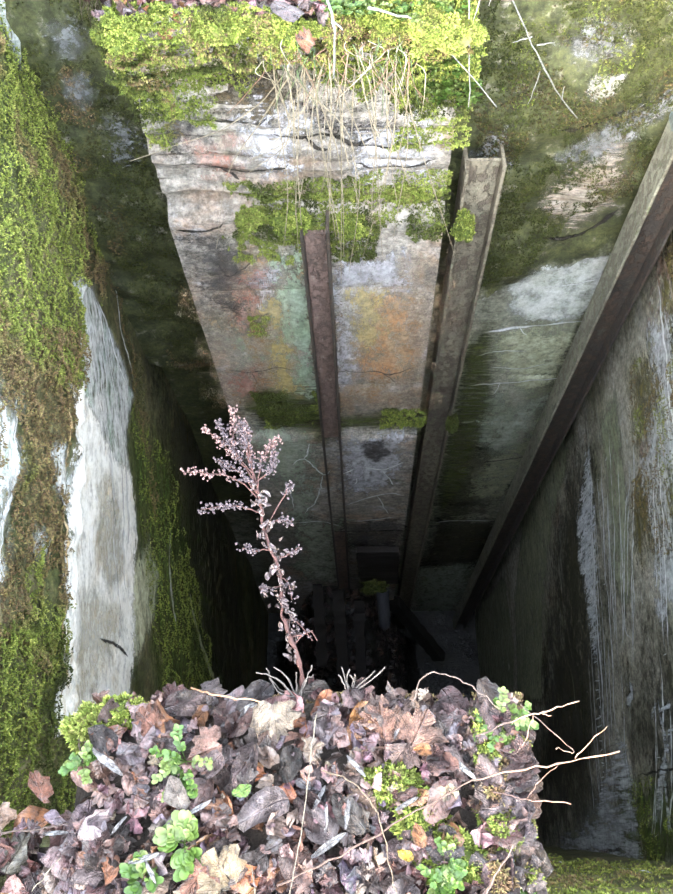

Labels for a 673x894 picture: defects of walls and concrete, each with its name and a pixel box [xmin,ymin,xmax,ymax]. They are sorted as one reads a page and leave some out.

crack [339,367,414,382]
rust [335,257,437,412]
leakage [487,253,611,391]
leakage [337,427,411,496]
leakage [475,294,673,859]
crack [642,768,673,776]